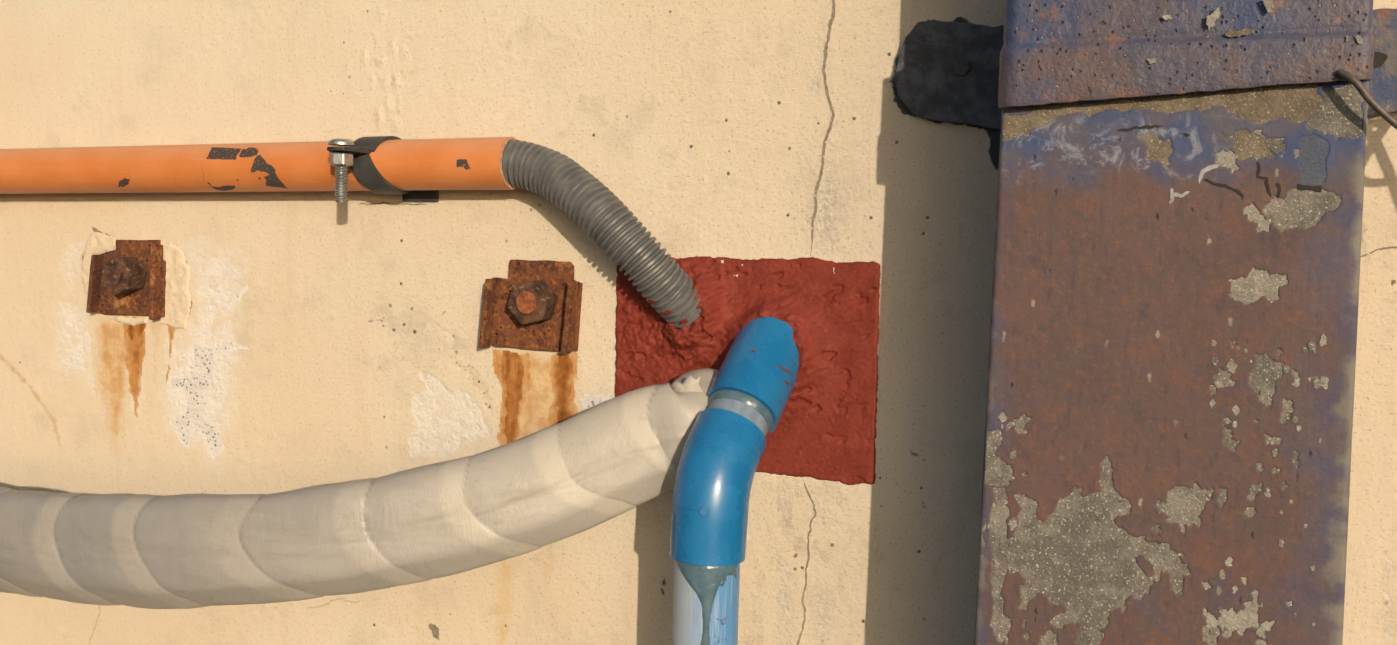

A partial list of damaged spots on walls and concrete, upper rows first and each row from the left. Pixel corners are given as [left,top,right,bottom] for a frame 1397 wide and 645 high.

peeling [1206,7,1254,37]
rust [90,312,175,466]
peeling [338,269,496,463]
rust [486,345,583,448]
crack [798,0,847,258]
peeling [1003,83,1364,174]
peeling [1229,267,1288,305]
peeling [1209,339,1329,517]
peeling [1243,183,1341,232]
peeling [1350,148,1397,645]
crack [797,477,854,645]
peeling [982,412,1275,645]